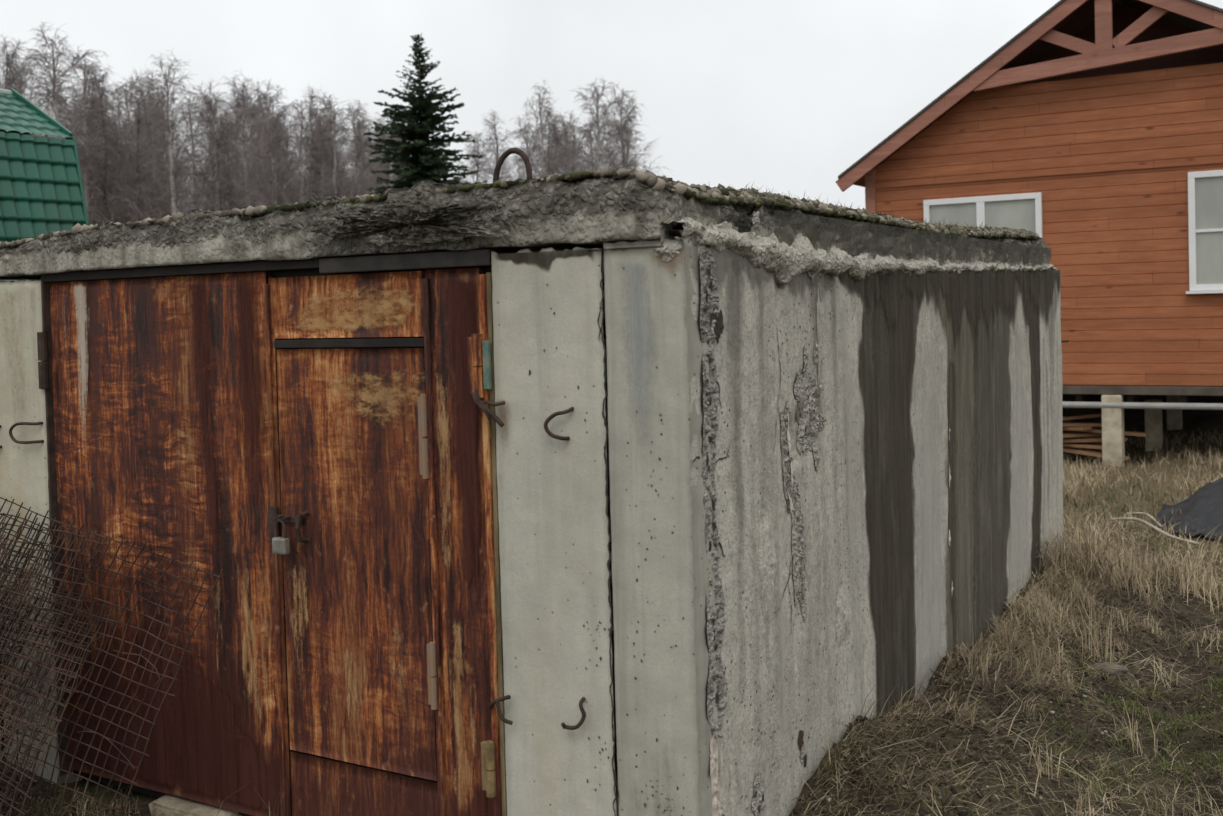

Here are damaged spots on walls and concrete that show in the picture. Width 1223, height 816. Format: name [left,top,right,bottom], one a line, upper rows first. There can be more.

spalling [732,211,760,233]
corrosion [301,289,414,330]
corrosion [330,373,418,416]
corrosion [437,380,450,526]
spalling [780,341,826,621]
damp [775,210,1061,717]
corrosion [238,569,261,714]
corrosion [292,570,308,661]
corrosion [344,652,365,717]
corrosion [450,624,476,801]